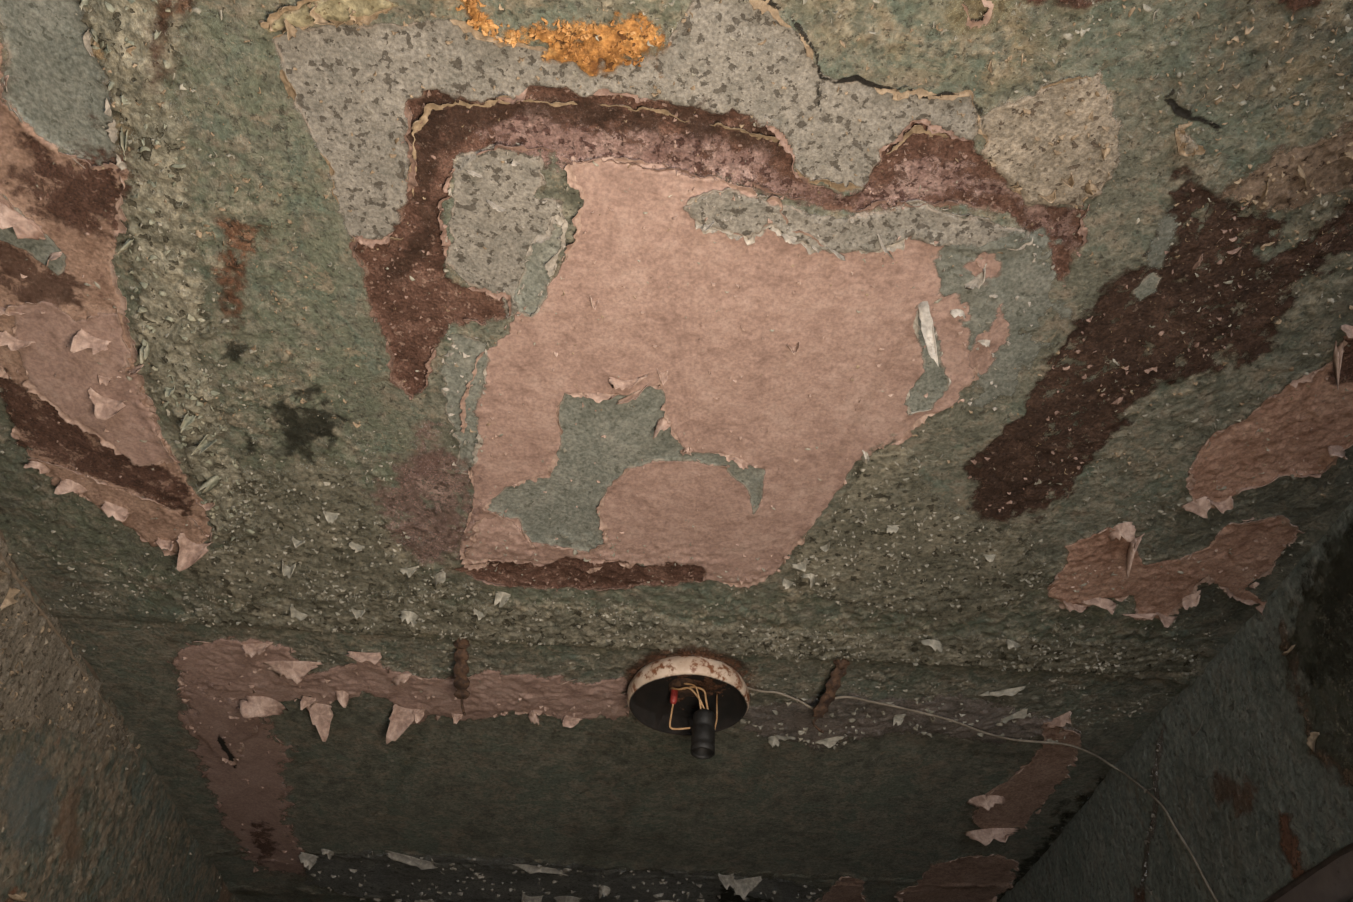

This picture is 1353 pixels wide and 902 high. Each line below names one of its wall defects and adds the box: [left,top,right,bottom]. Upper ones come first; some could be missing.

peeling [150,73,195,119]
peeling [1030,0,1160,41]
peeling [1142,7,1255,142]
peeling [1267,2,1353,129]
peeling [1149,185,1353,366]
peeling [164,333,303,429]
peeling [1082,331,1198,418]
peeling [1029,418,1174,497]